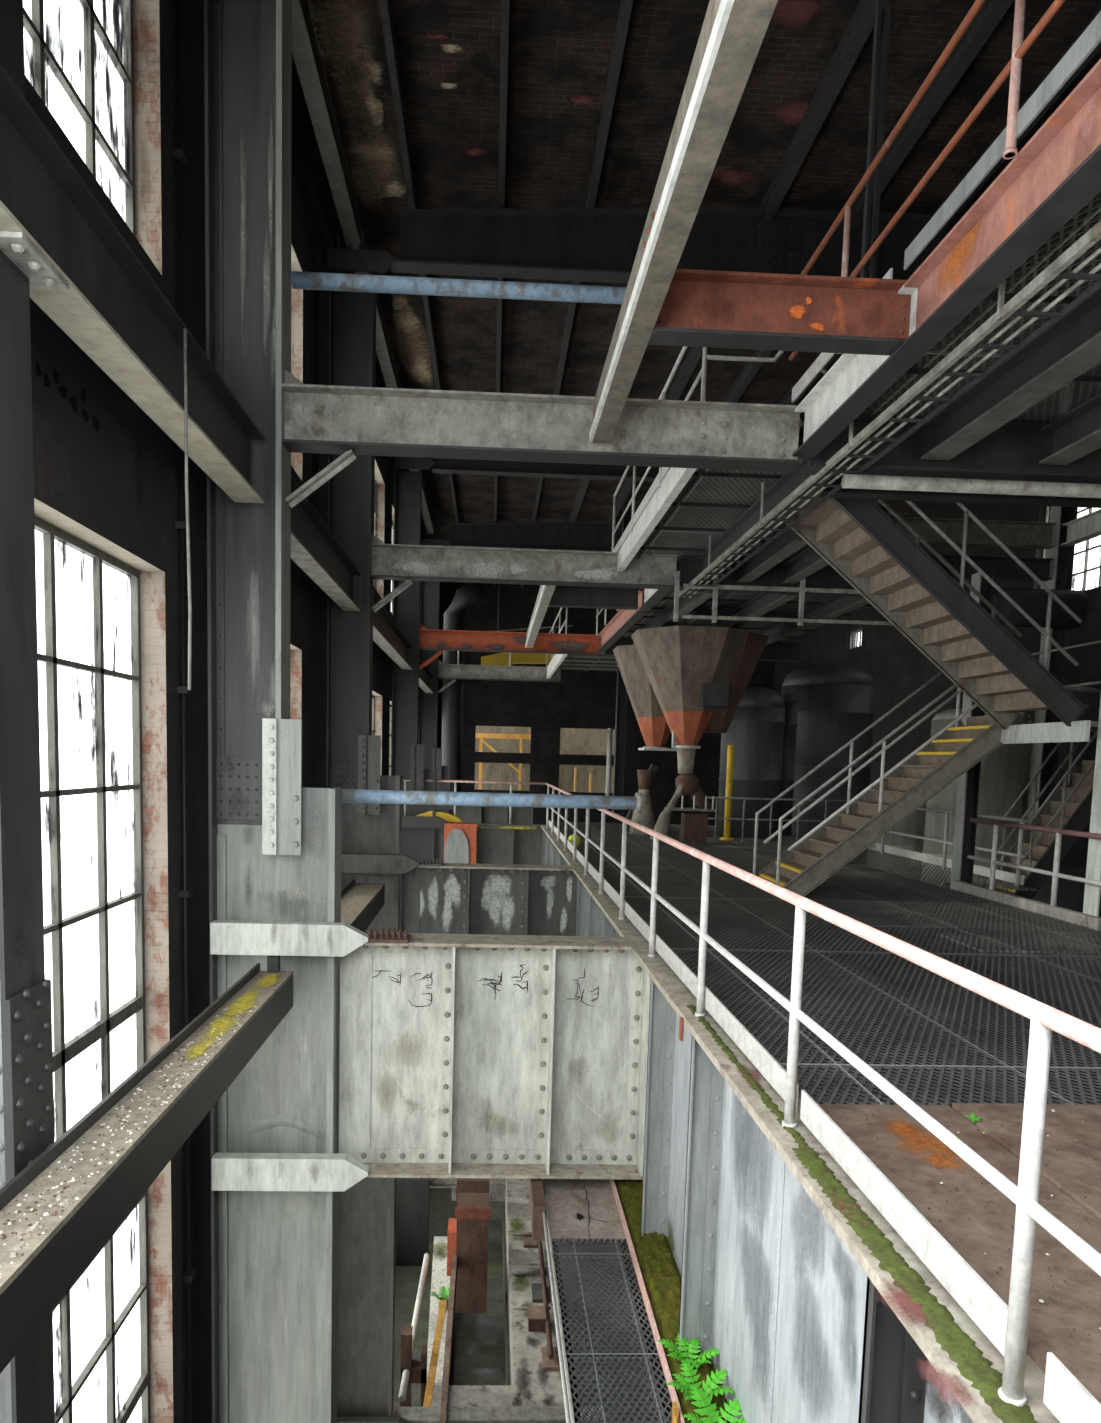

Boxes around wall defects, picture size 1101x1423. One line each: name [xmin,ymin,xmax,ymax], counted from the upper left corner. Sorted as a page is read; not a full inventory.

rust [789,296,824,331]
damp [420,874,461,931]
damp [481,875,514,931]
damp [540,876,573,932]